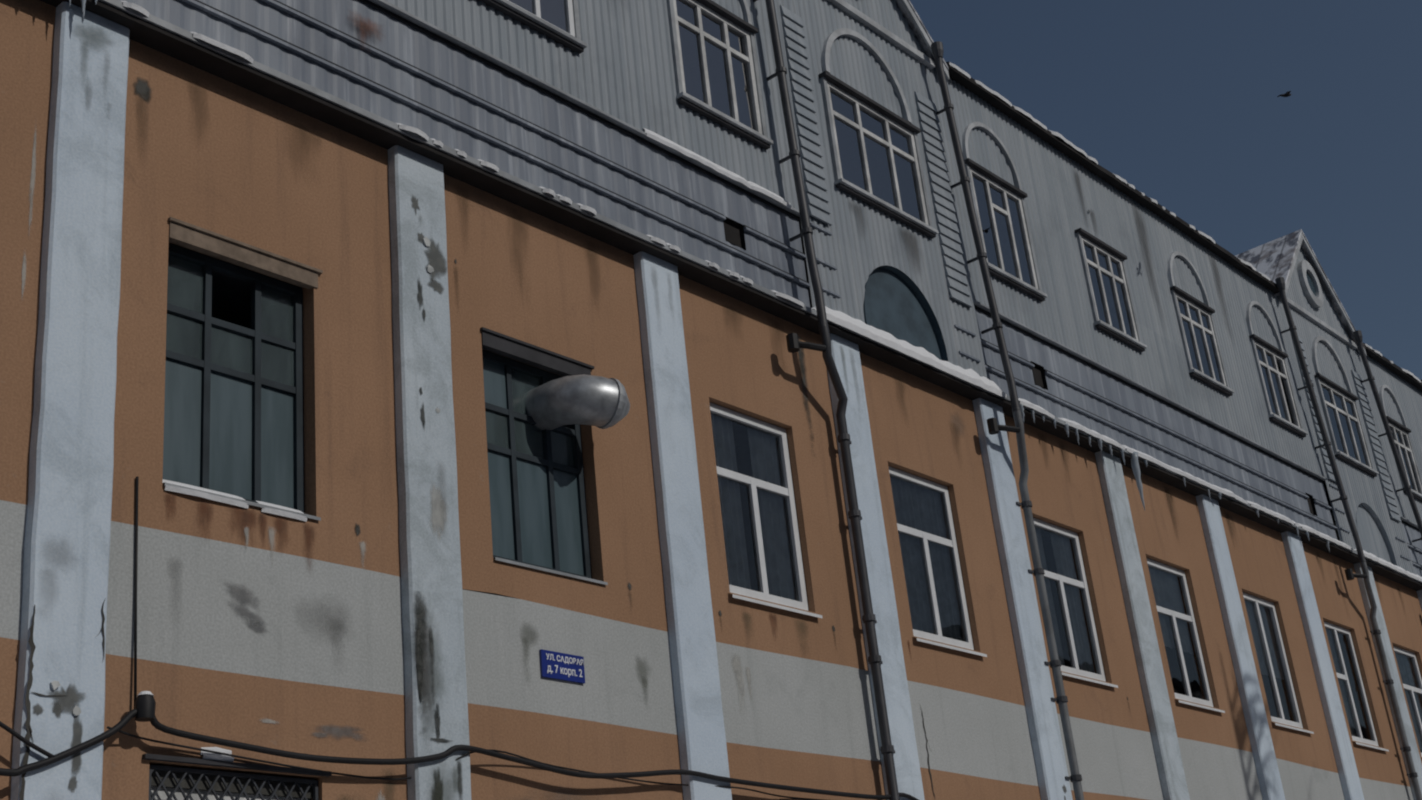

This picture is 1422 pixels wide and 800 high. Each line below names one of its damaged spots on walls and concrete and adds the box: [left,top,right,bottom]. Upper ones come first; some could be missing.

spalling [417,233,446,320]
crack [19,605,68,800]
spalling [34,681,83,791]